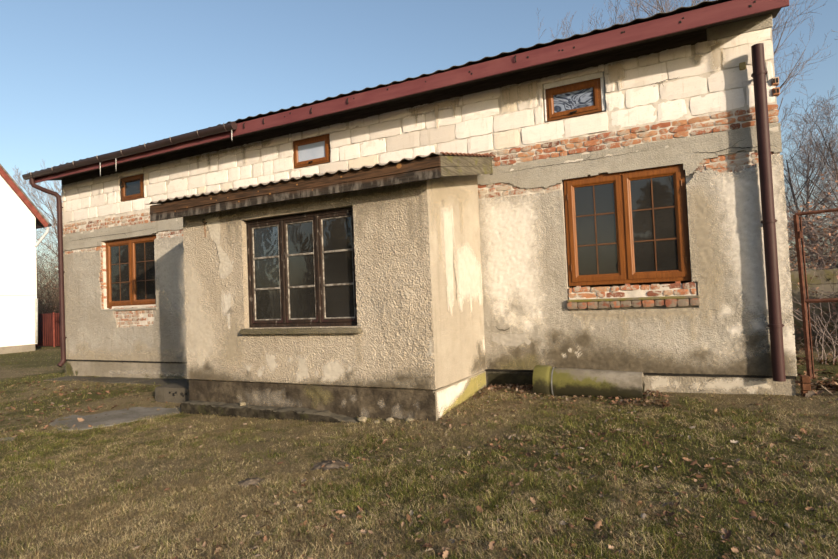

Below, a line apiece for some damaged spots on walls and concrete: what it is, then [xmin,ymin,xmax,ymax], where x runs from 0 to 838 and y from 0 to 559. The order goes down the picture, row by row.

spalling [203,214,234,279]
spalling [64,245,156,328]
water stain [297,368,435,389]
water stain [471,310,772,387]
water stain [784,352,797,376]